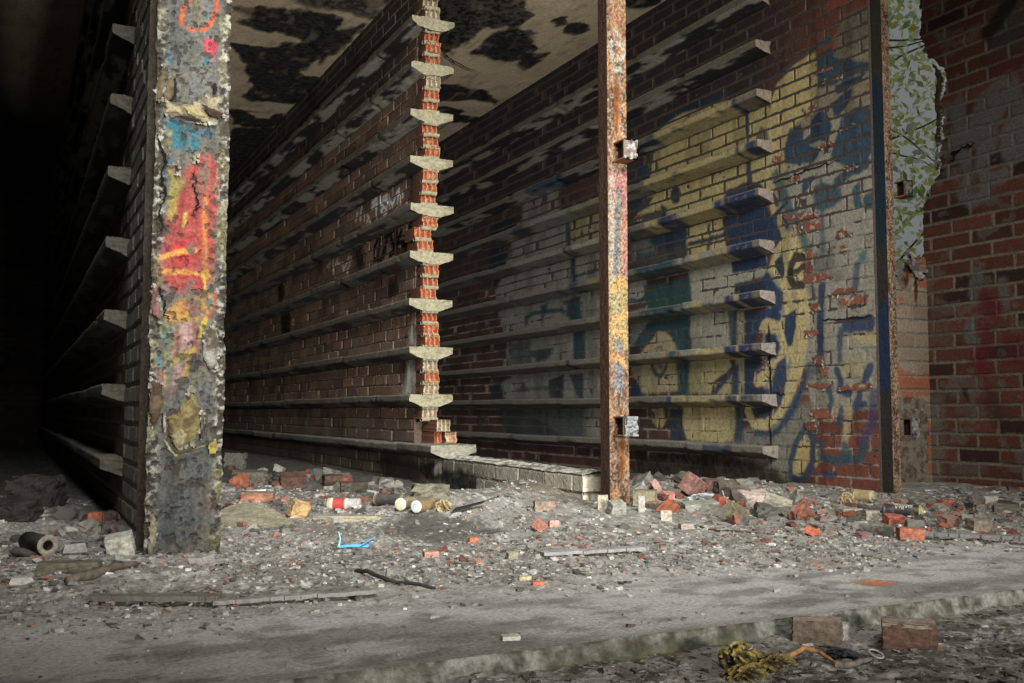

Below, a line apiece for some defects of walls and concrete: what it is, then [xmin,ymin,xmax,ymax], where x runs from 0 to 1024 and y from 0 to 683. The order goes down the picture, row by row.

spalling [153,63,226,126]
spalling [932,63,945,170]
peeling [173,151,200,176]
crack [773,160,840,183]
crack [192,172,200,216]
peeling [150,283,162,319]
peeling [803,248,869,338]
peeling [202,321,220,369]
peeling [806,355,873,392]
spalling [148,376,217,456]
peeling [147,510,158,554]